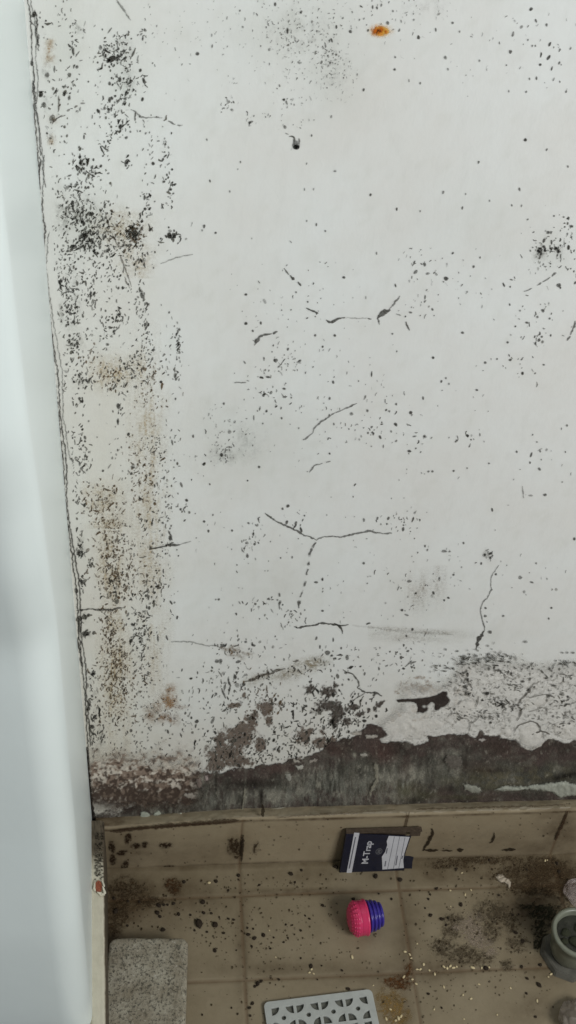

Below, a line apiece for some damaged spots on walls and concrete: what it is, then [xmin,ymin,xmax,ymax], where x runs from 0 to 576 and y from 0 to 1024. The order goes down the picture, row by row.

rust [373,26,389,36]
crack [284,268,410,331]
water stain [32,0,576,773]
crack [265,513,392,634]
crack [476,567,498,649]
peeling [90,661,576,821]